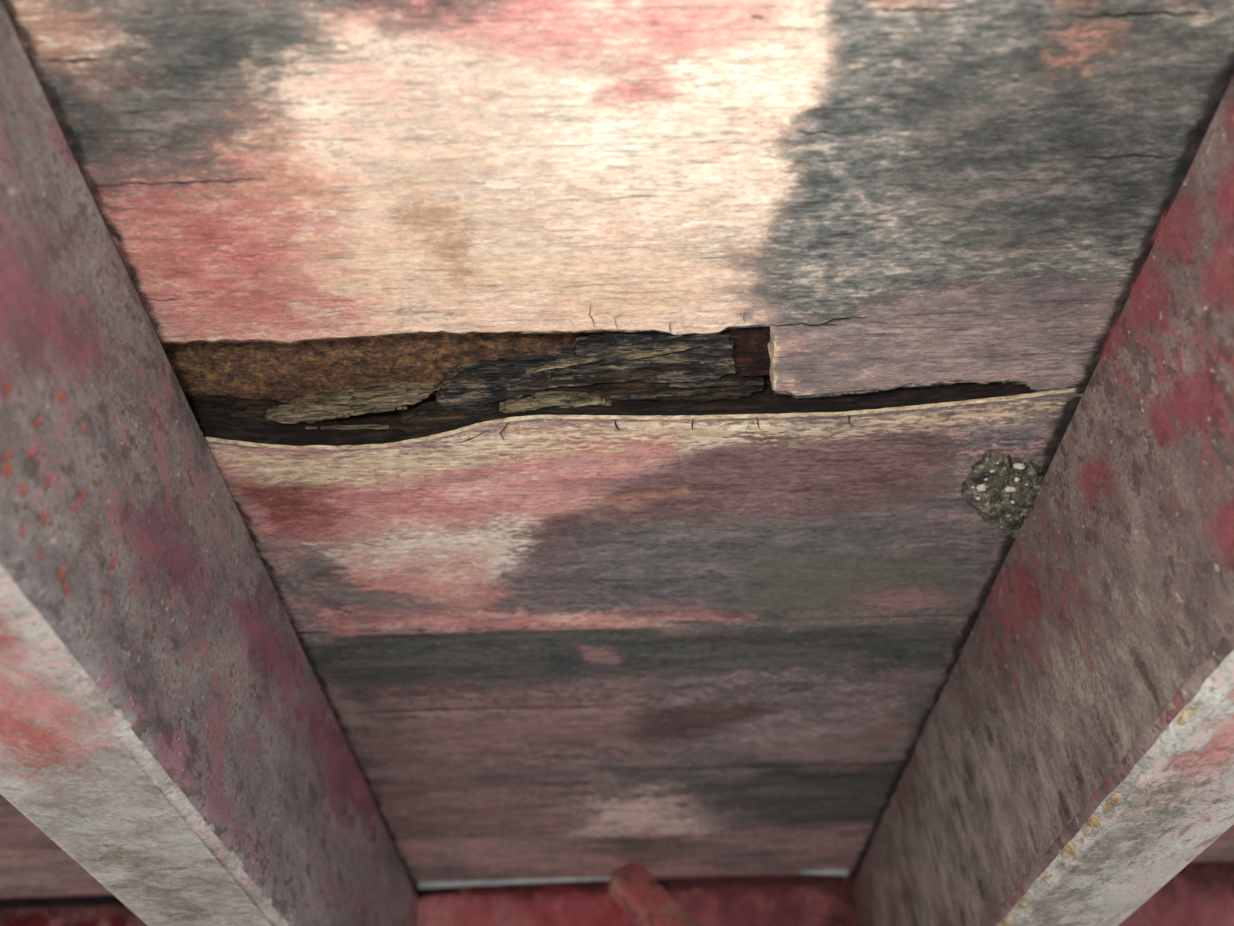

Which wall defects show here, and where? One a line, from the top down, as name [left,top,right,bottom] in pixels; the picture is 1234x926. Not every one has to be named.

water stain [1,0,491,348]
crack [452,422,509,444]
crack [743,313,866,326]
water stain [729,0,1234,478]